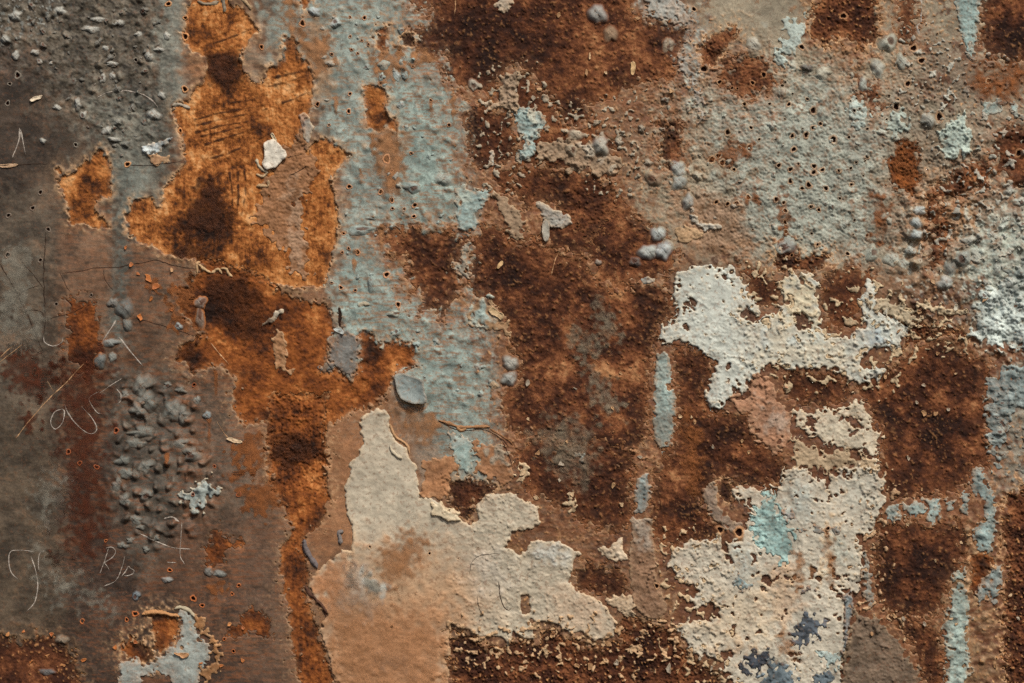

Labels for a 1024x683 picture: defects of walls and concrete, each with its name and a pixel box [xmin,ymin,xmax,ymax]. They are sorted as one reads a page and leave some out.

rust [805,0,928,55]
rust [972,0,1024,103]
rust [120,0,442,683]
rust [363,0,798,548]
peeling [302,0,1024,683]
rust [782,320,996,503]
rust [864,120,1024,285]
rust [0,628,86,683]
peeling [117,594,236,683]
rust [444,616,721,683]
rust [572,558,630,598]
rust [872,485,1024,683]